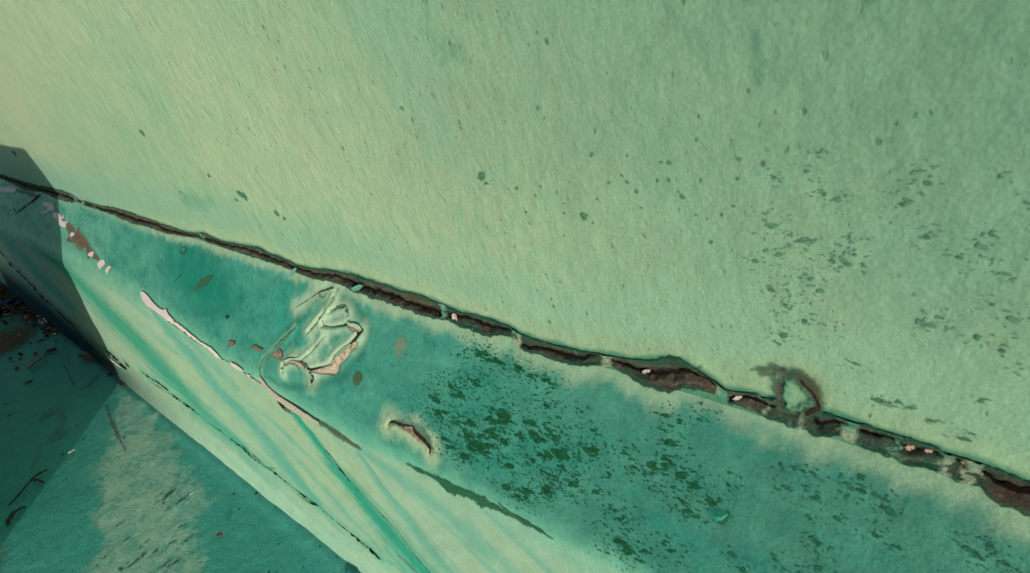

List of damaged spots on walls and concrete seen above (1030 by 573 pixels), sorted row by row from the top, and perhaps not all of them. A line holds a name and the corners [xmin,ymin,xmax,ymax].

peeling [41,201,75,237]
peeling [88,251,111,273]
crack [0,252,430,573]
peeling [140,284,370,451]
crack [0,174,1030,517]
damp [498,503,553,540]